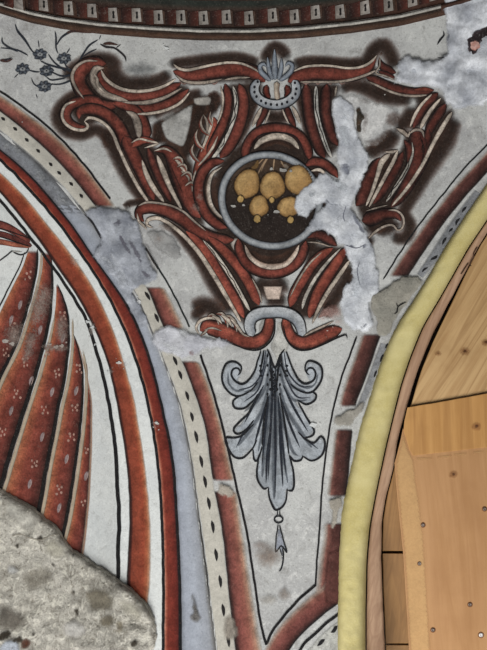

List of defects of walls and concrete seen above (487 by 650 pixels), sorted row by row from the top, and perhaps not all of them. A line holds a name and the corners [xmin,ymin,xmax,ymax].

spalling [467,27,487,54]
spalling [0,488,157,650]